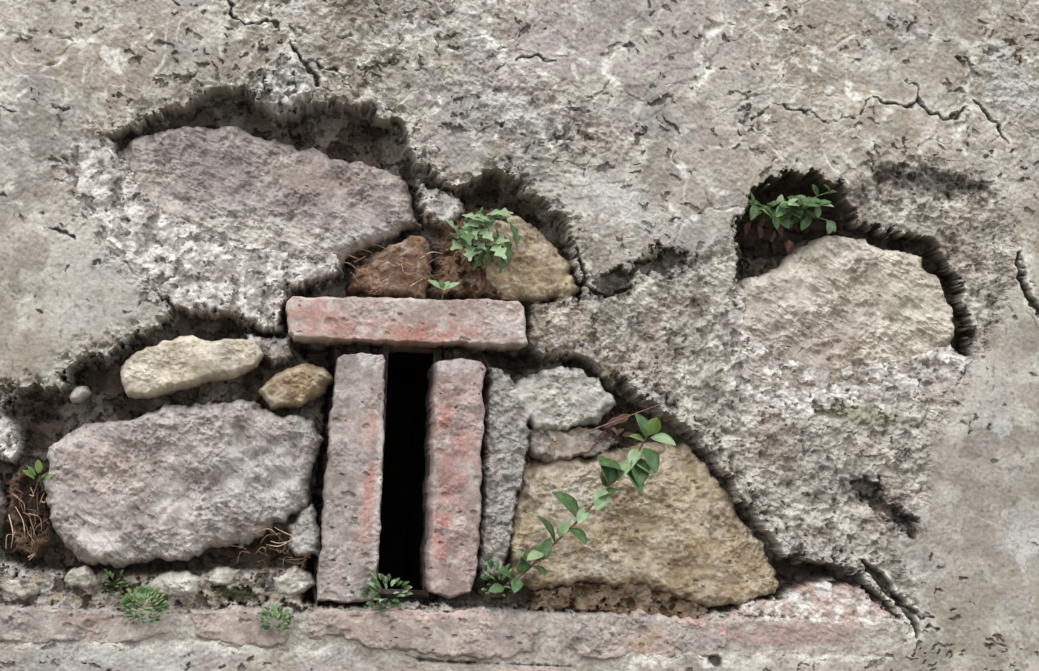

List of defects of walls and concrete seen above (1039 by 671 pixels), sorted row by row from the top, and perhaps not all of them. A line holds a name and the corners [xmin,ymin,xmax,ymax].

flaking render [0,85,910,671]
flaking render [586,153,1029,610]
crack [750,79,1011,145]
crack [1014,249,1039,318]